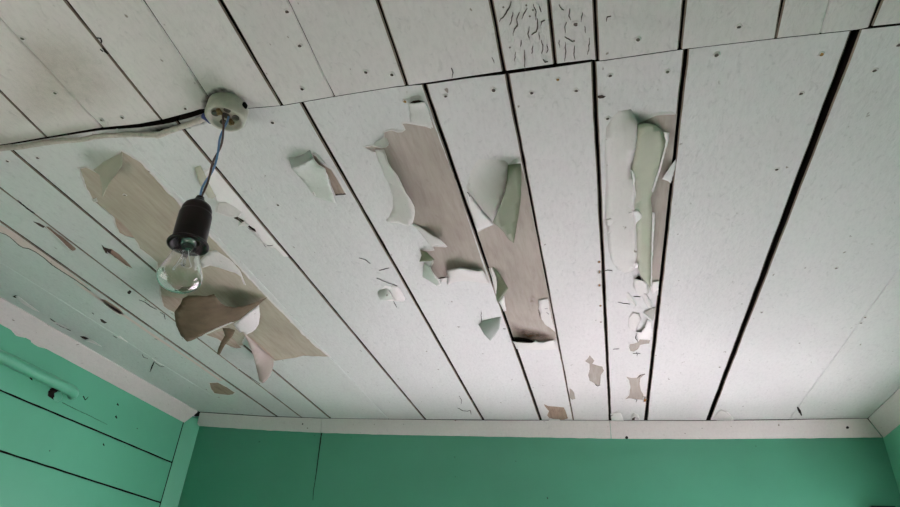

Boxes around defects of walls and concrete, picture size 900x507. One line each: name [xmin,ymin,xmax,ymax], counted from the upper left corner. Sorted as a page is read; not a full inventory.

crack [492,3,611,67]
peeling [77,149,182,269]
peeling [195,166,288,257]
peeling [289,150,347,203]
peeling [363,100,557,350]
peeling [605,109,677,297]
peeling [0,221,236,395]
peeling [140,233,331,383]
peeling [543,389,575,420]
peeling [584,355,605,386]
peeling [628,339,651,355]